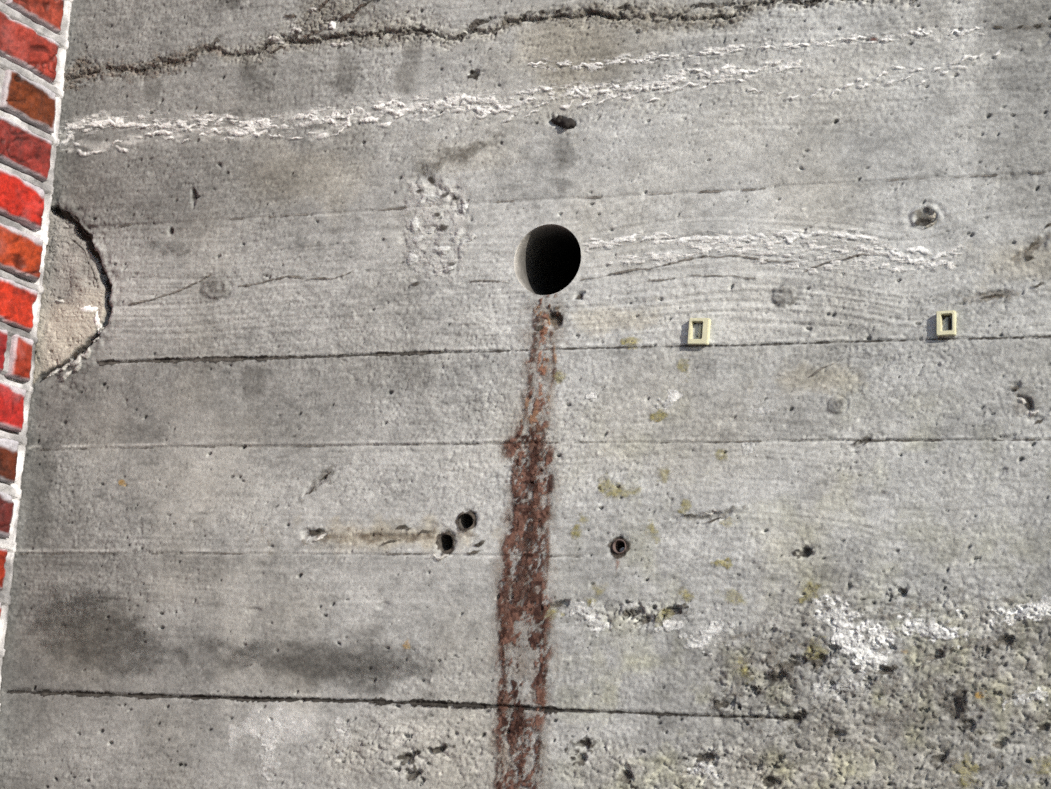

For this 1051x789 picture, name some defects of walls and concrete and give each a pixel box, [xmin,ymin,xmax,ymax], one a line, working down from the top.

crack [70,0,858,81]
efflorescence [58,26,1000,156]
spalling [33,205,112,384]
efflorescence [584,229,962,273]
corrosion [495,294,557,789]
efflorescence [814,594,969,700]
efflorescence [989,593,1051,626]